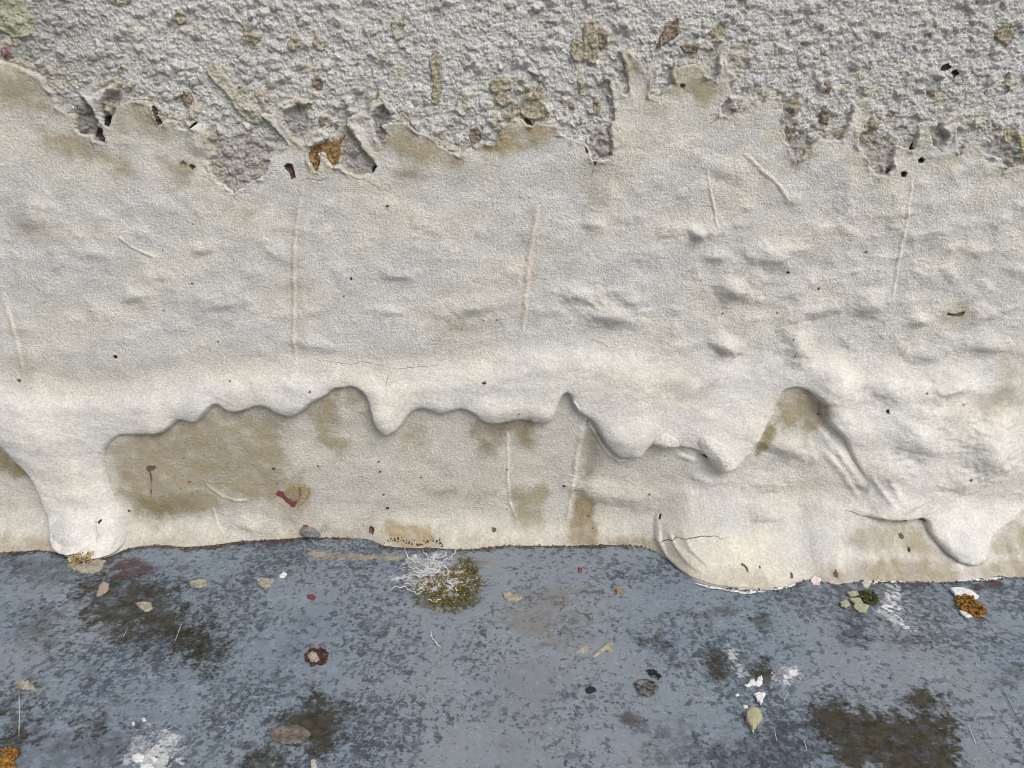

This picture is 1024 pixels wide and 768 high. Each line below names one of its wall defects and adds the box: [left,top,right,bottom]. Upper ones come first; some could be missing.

peeling [0,0,36,60]
peeling [287,30,327,91]
spalling [298,106,346,171]
peeling [412,52,443,106]
peeling [469,75,550,144]
peeling [569,18,608,65]
peeling [644,18,699,62]
peeling [812,67,865,139]
peeling [859,112,896,145]
peeling [994,22,1015,47]
leakage [123,413,281,513]
leakage [571,490,597,542]